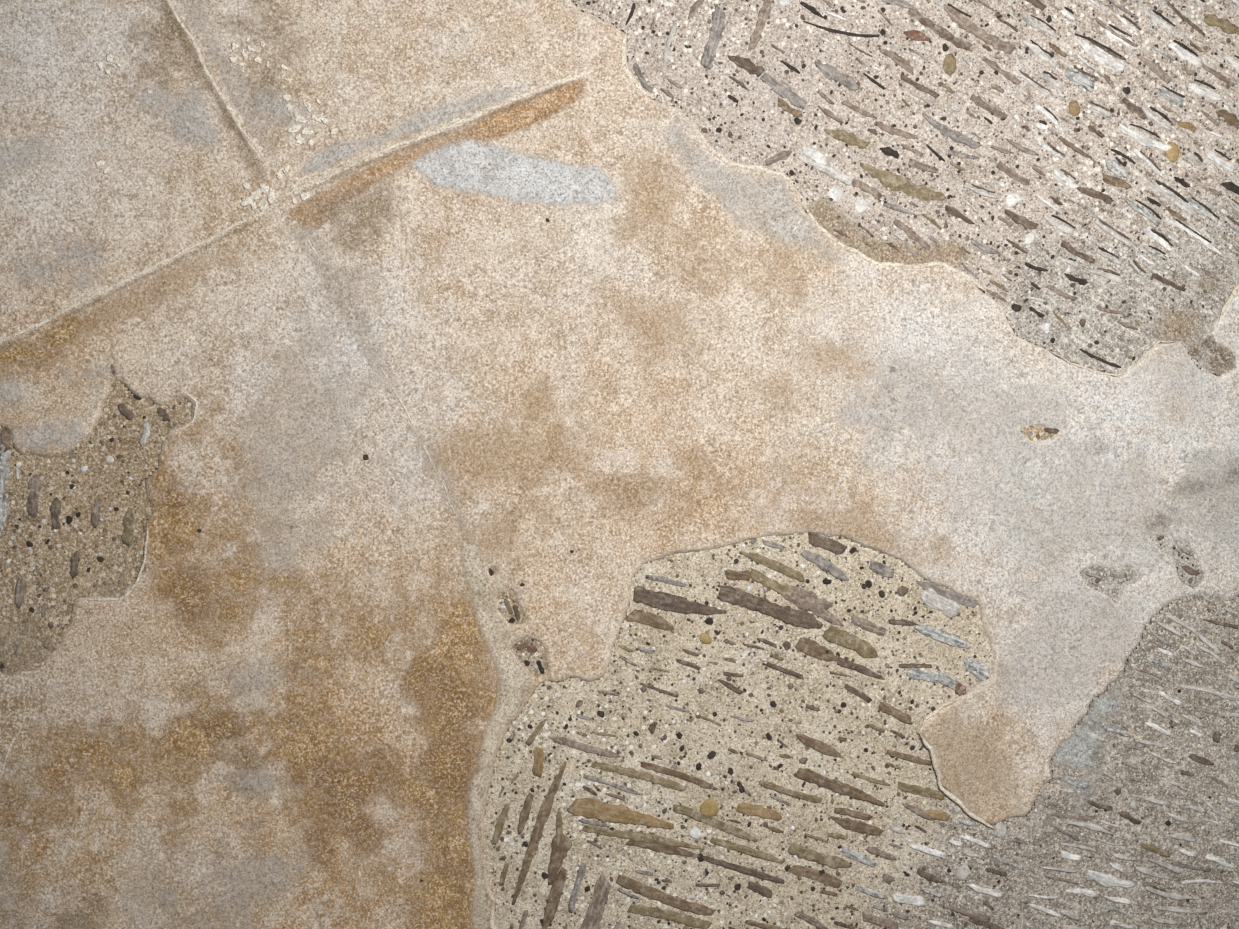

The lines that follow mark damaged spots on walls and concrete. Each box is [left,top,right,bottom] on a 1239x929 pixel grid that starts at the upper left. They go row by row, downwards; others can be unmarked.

crack [166,0,266,163]
crack [0,71,594,521]
flaking render [571,0,1239,376]
flaking render [0,381,198,675]
flaking render [462,532,1239,929]